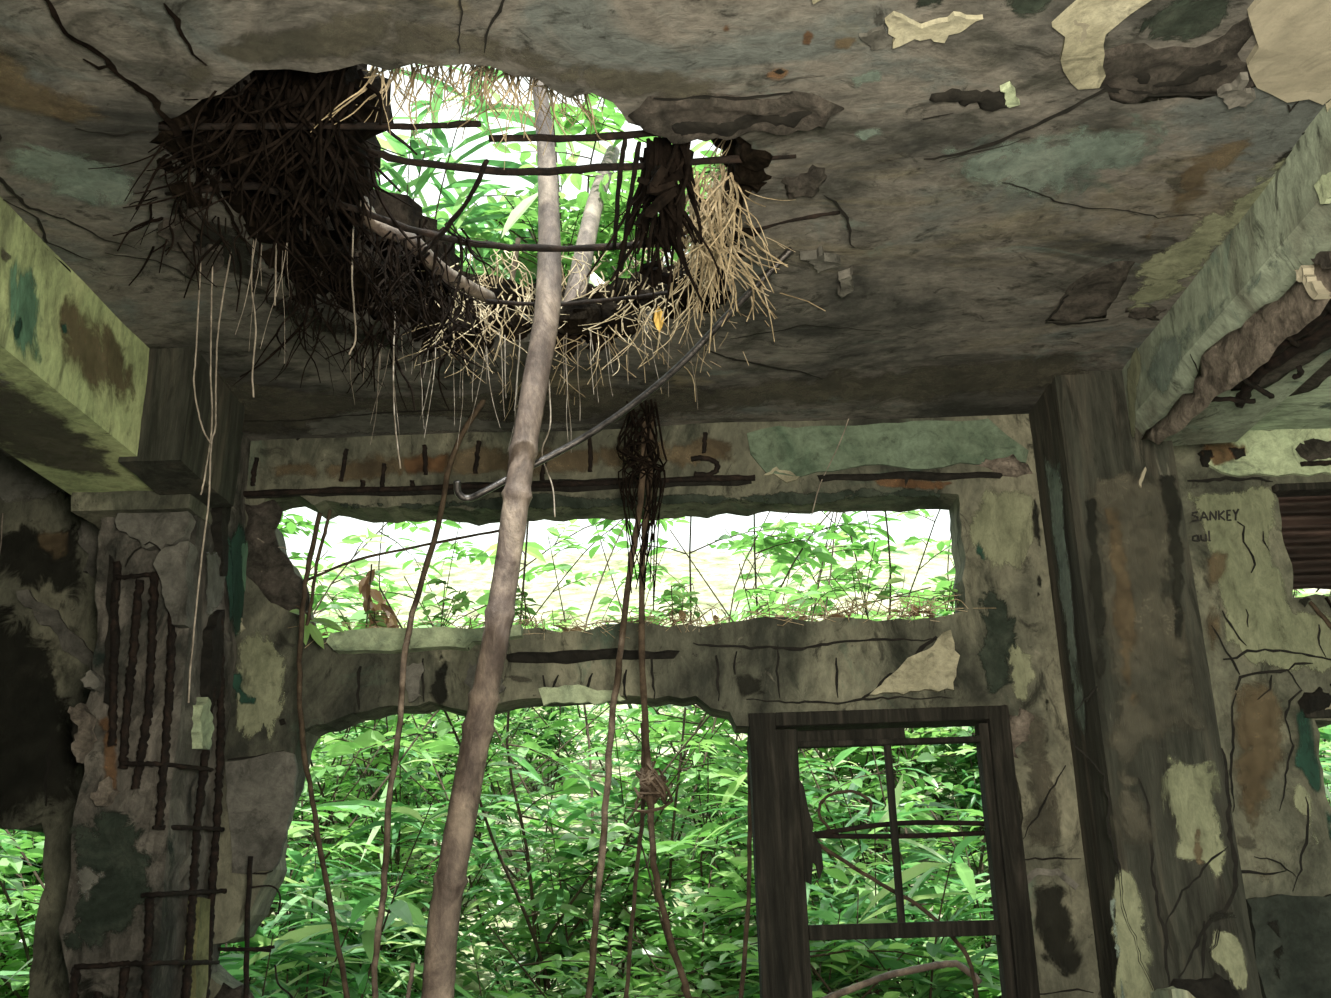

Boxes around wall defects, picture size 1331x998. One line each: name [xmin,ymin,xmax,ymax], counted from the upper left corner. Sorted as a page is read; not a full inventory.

crack [44,0,245,242]
spalling [1052,0,1331,112]
crack [0,177,232,289]
spalling [157,91,844,347]
damp [60,298,135,408]
spalling [1141,251,1331,444]
crack [1237,521,1270,573]
flaking render [16,409,515,998]
spalling [862,630,960,698]
crack [1023,609,1331,991]
peeling [1163,757,1297,878]
damp [1235,682,1283,826]